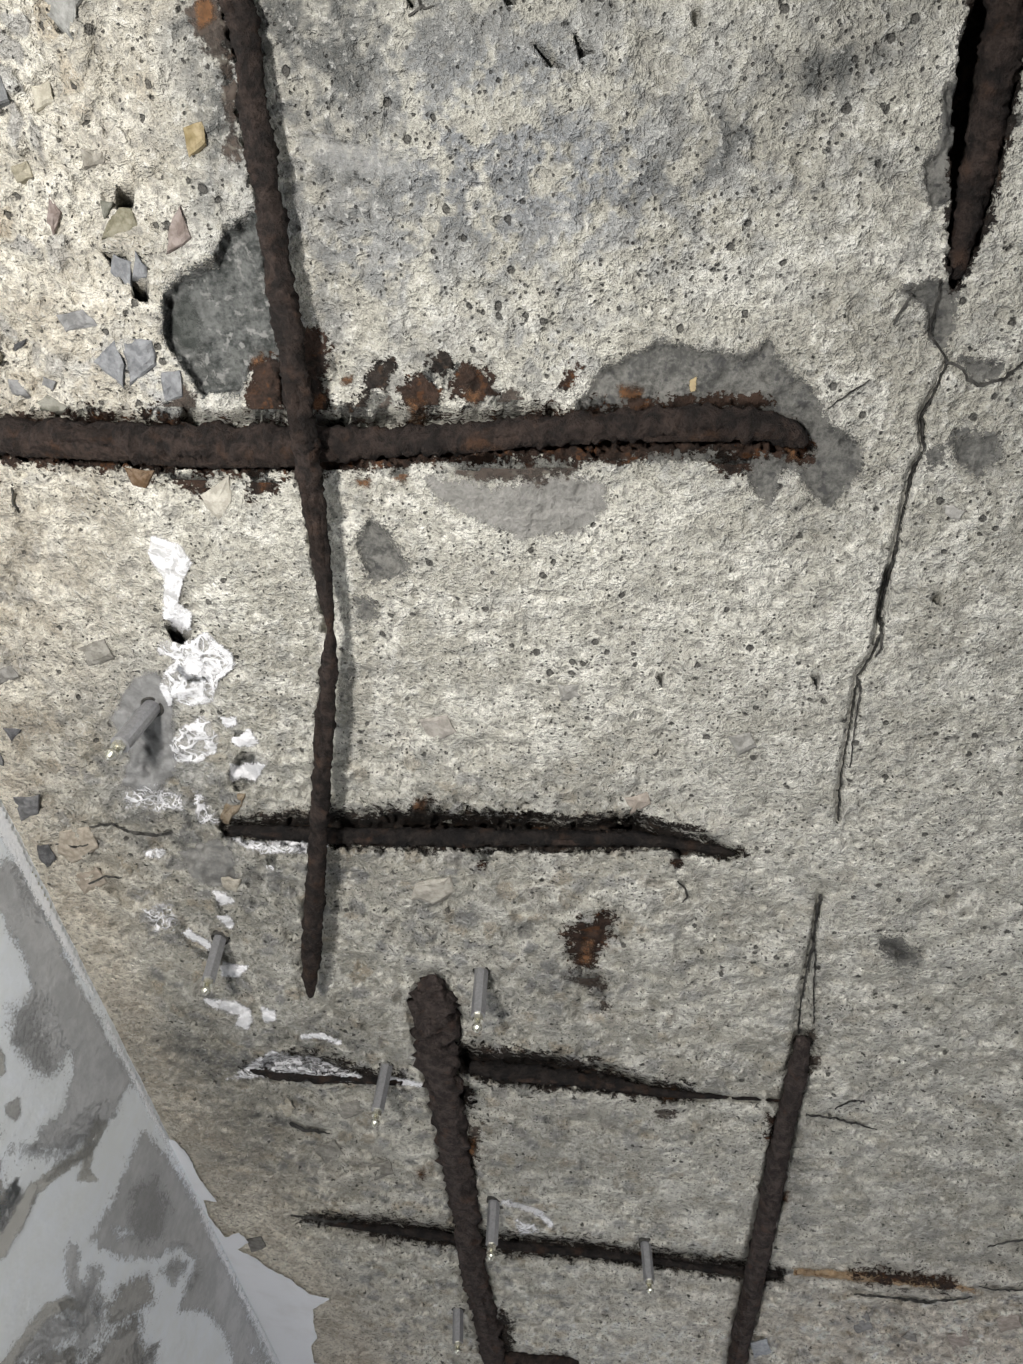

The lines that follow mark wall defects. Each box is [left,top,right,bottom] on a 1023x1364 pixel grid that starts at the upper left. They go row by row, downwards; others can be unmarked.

spalling [0,0,288,427]
corrosion [943,0,1023,295]
damp [148,536,265,782]
corrosion [0,0,818,1014]
crack [837,279,1023,821]
damp [233,837,308,870]
peeling [0,857,134,1259]
peeling [86,1129,279,1364]
damp [204,998,277,1030]
damp [226,1051,362,1081]
corrosion [237,974,977,1364]
spalling [483,1247,743,1364]